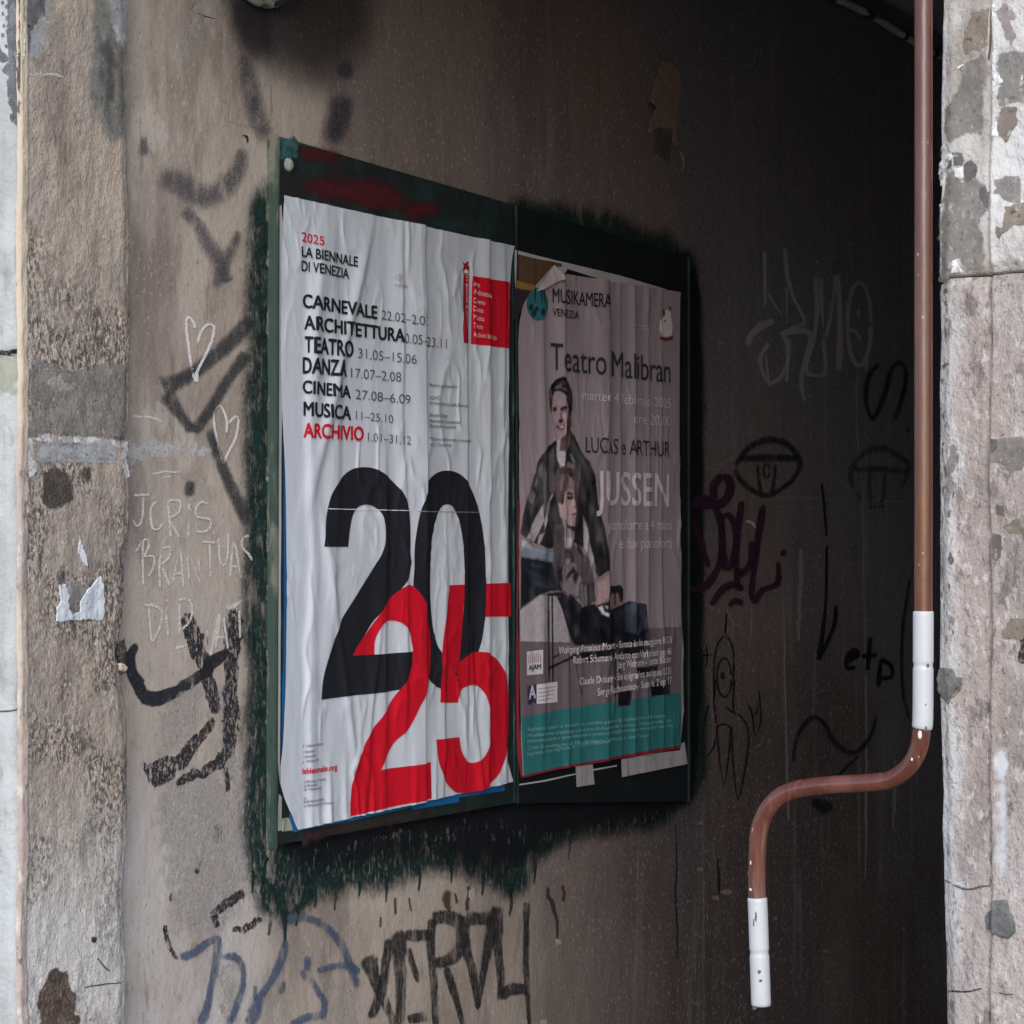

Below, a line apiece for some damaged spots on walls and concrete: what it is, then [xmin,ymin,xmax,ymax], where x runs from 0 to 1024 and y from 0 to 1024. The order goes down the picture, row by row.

flaking render [938,3,1024,322]
spalling [940,442,959,498]
spalling [941,552,955,641]
spalling [37,968,80,1024]